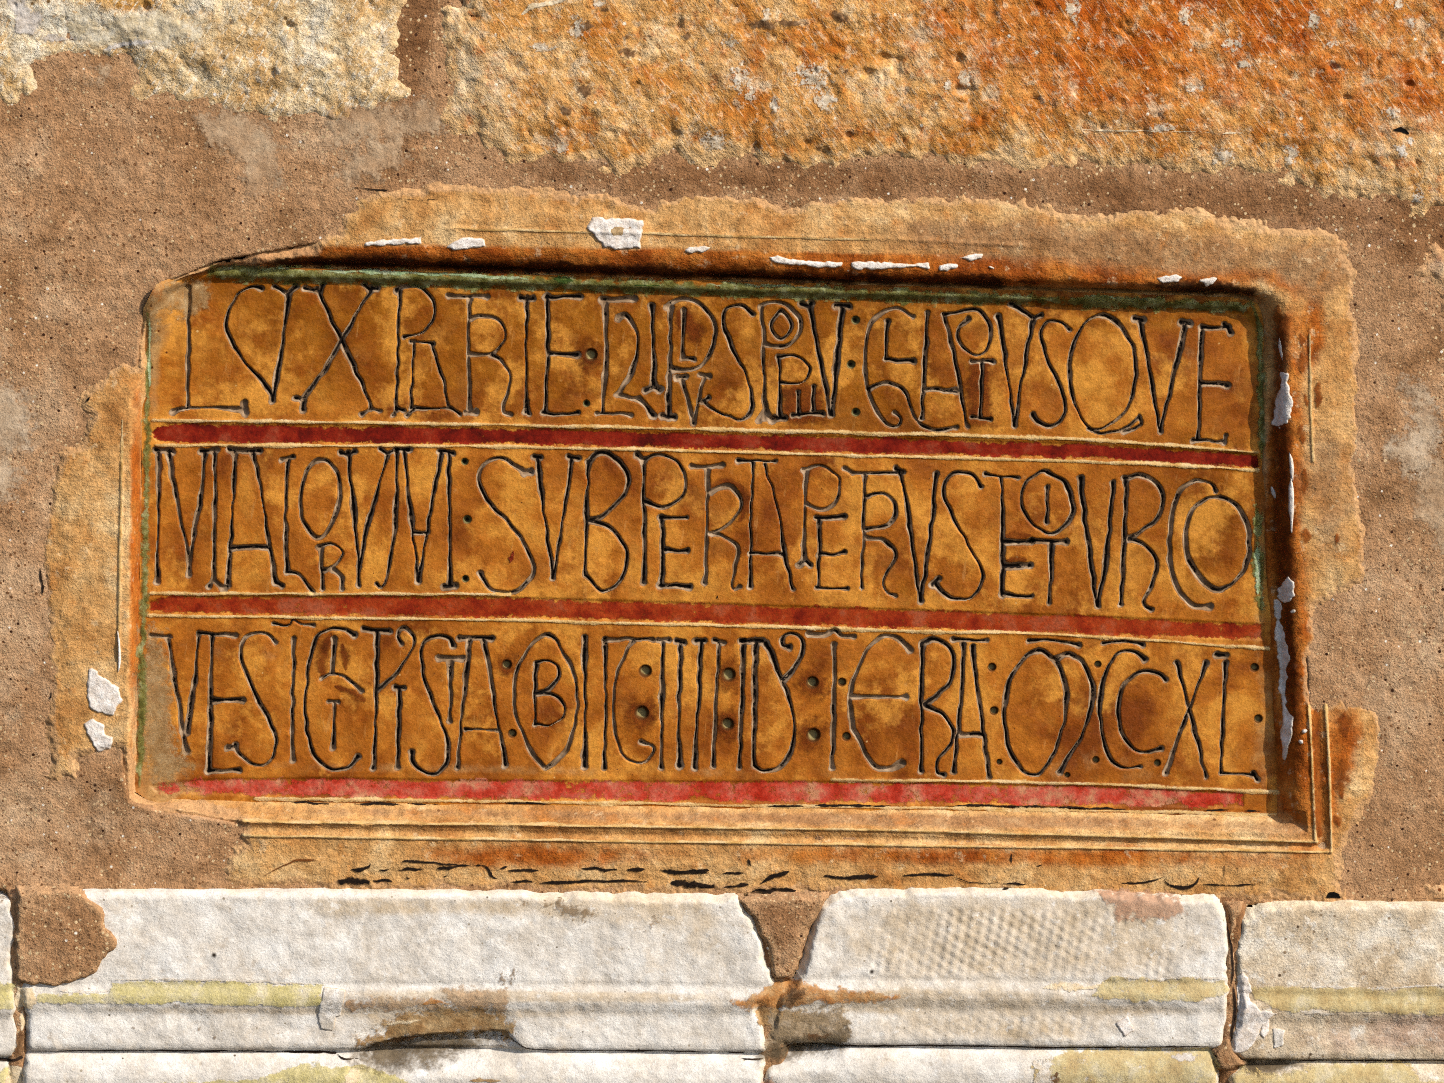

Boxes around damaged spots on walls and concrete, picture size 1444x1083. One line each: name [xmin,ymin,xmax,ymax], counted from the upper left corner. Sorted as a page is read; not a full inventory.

peeling [447,237,486,250]
spalling [587,217,644,250]
peeling [768,253,994,272]
peeling [1271,338,1293,429]
peeling [1271,452,1294,533]
peeling [84,633,123,752]
peeling [1273,577,1308,760]
crack [264,854,1043,893]
crack [1123,866,1256,891]
crack [500,1035,794,1060]
spalling [731,978,911,1050]
crack [834,925,1237,1049]